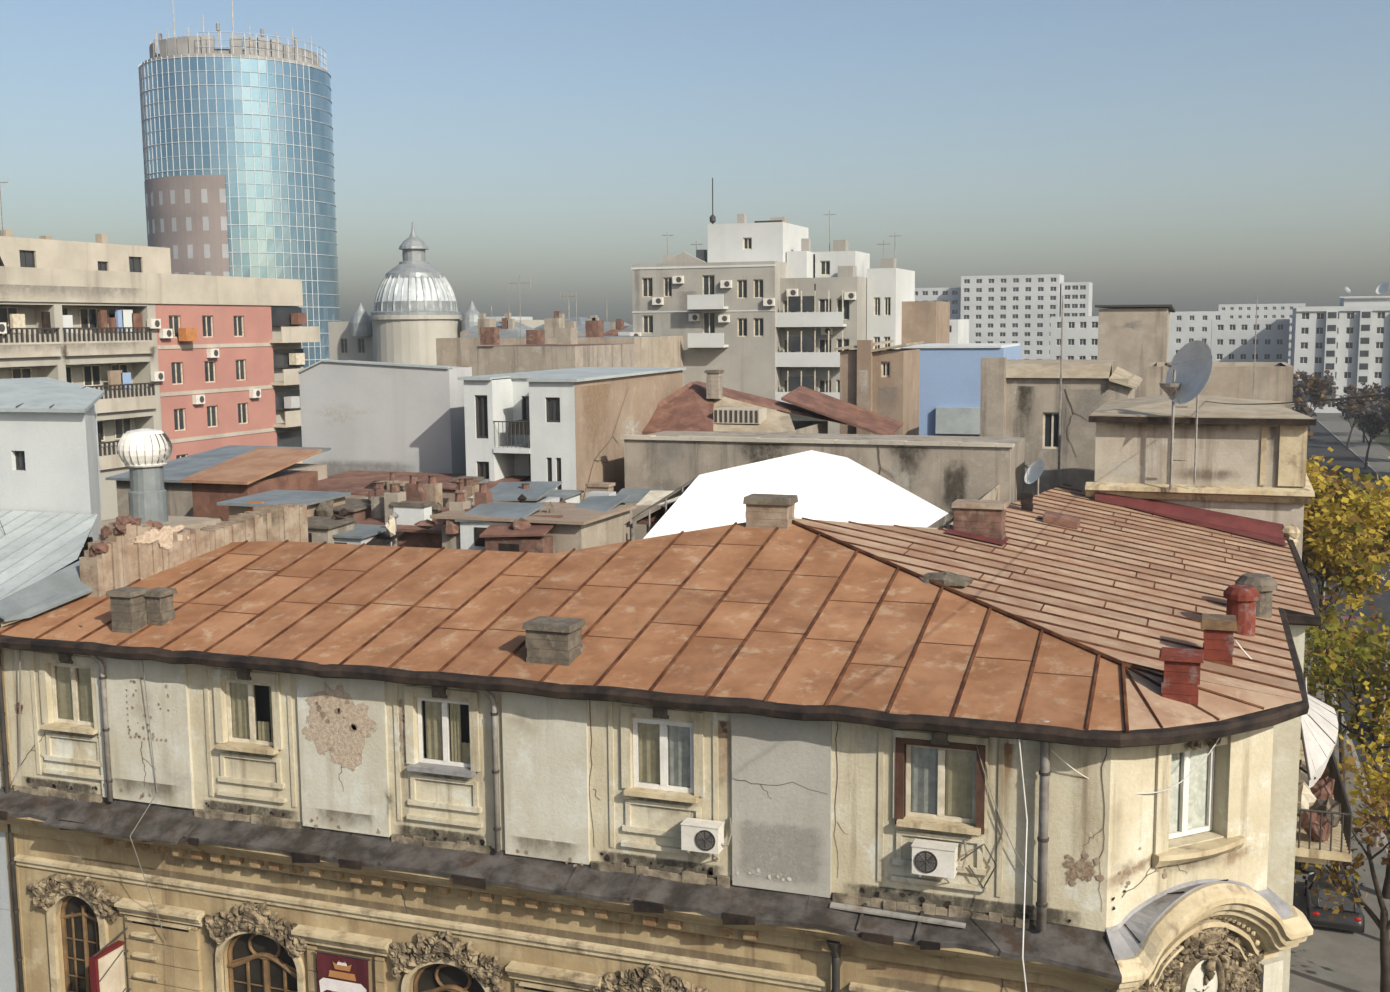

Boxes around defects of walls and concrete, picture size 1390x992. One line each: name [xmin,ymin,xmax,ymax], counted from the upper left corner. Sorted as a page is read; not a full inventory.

flaking render [302,684,376,790]
crack [733,722,848,878]
flaking render [1063,847,1167,910]